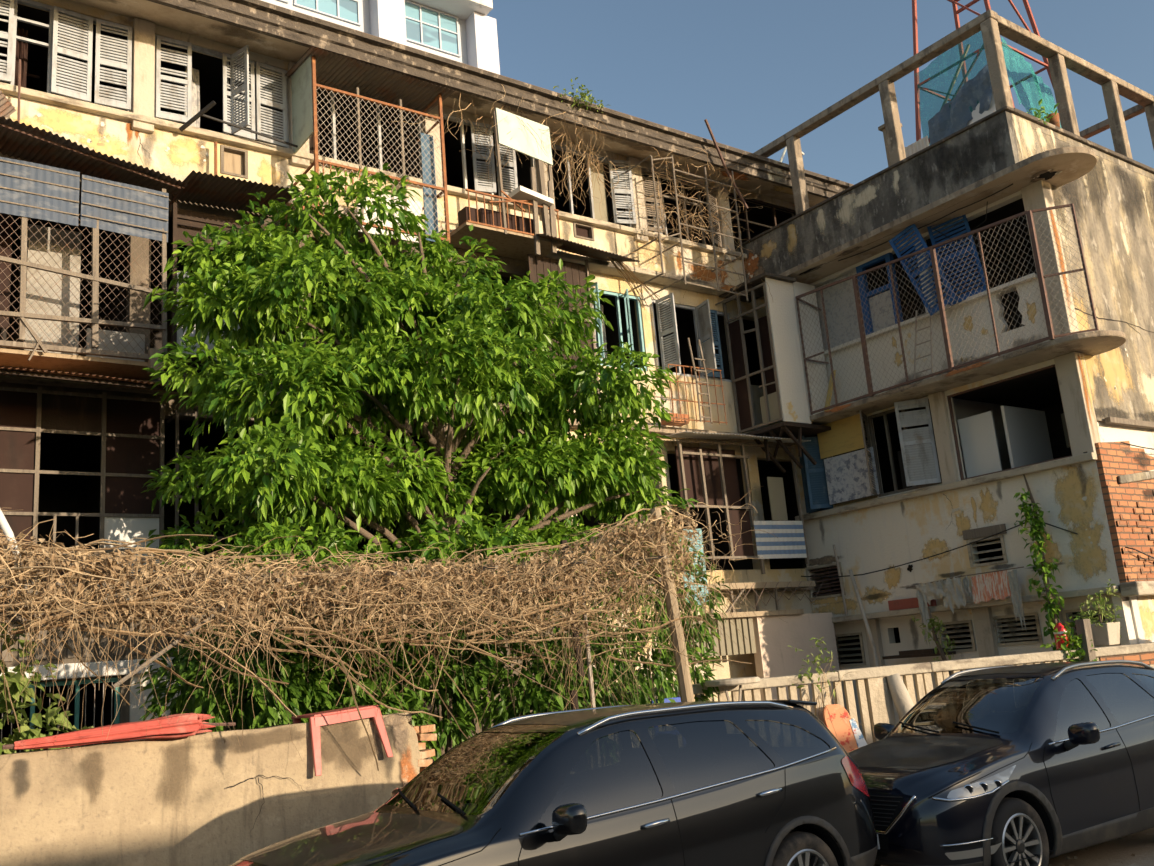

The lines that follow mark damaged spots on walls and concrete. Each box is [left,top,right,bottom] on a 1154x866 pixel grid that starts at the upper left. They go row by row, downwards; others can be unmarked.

water stain [213,25,260,41]
water stain [1013,115,1055,157]
water stain [817,185,876,229]
water stain [1054,160,1154,258]
water stain [788,225,797,252]
rust [677,251,728,284]
peeling [1074,300,1089,331]
peeling [1084,347,1154,408]
water stain [1095,408,1154,422]
peeling [923,489,998,560]
peeling [1034,465,1107,579]
peeling [810,565,913,614]